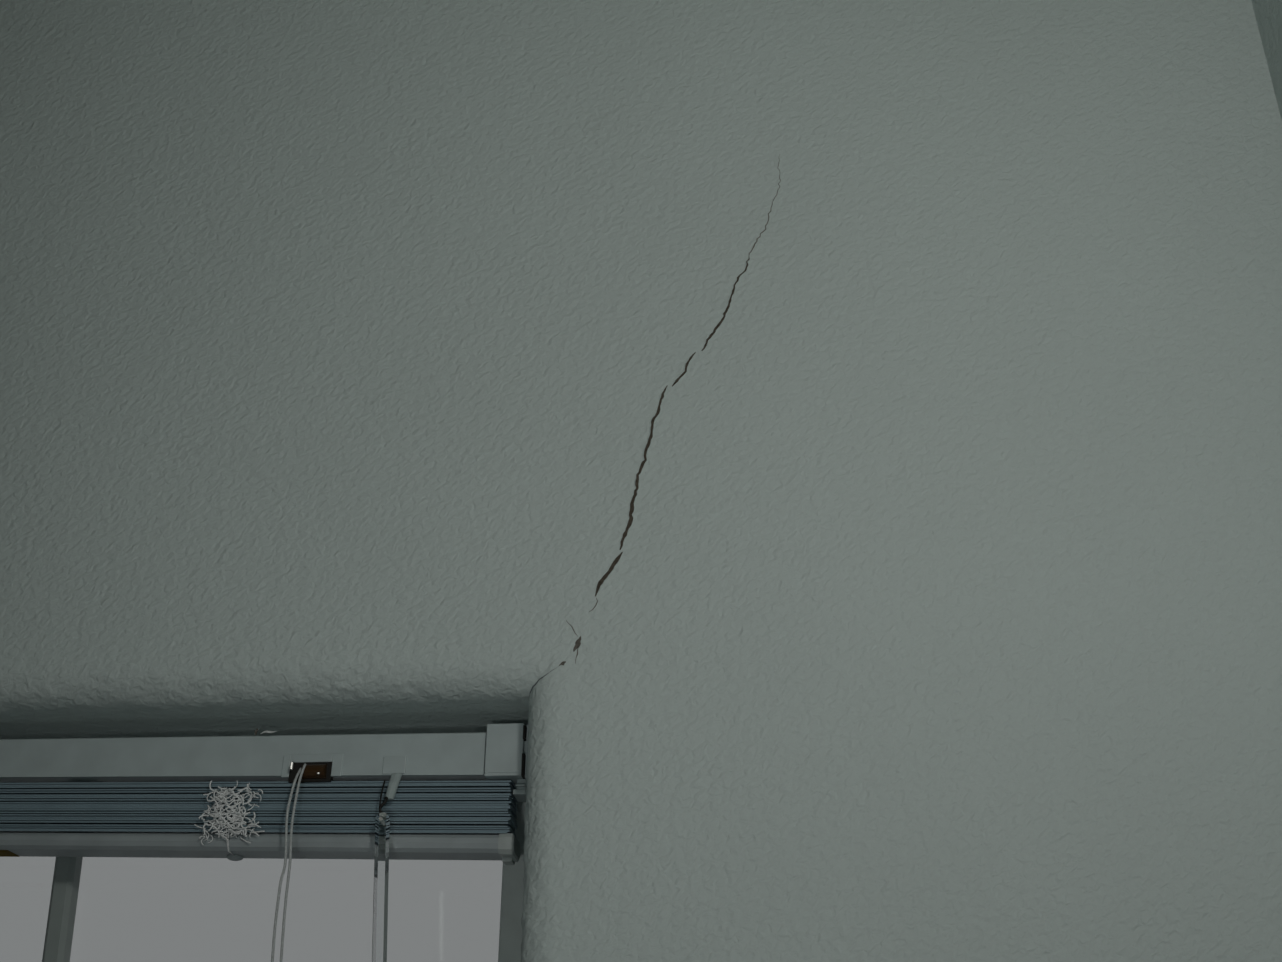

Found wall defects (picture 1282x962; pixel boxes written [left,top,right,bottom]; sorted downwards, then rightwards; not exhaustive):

crack [528,155,781,711]